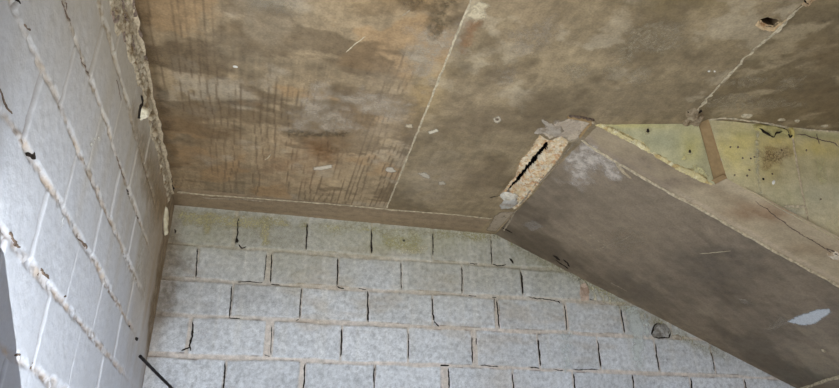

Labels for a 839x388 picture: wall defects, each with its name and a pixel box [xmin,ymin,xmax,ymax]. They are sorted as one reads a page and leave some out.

hole [755,15,787,32]
spalling [109,0,172,235]
spalling [490,115,712,212]
crack [797,134,839,147]
crack [760,205,835,253]